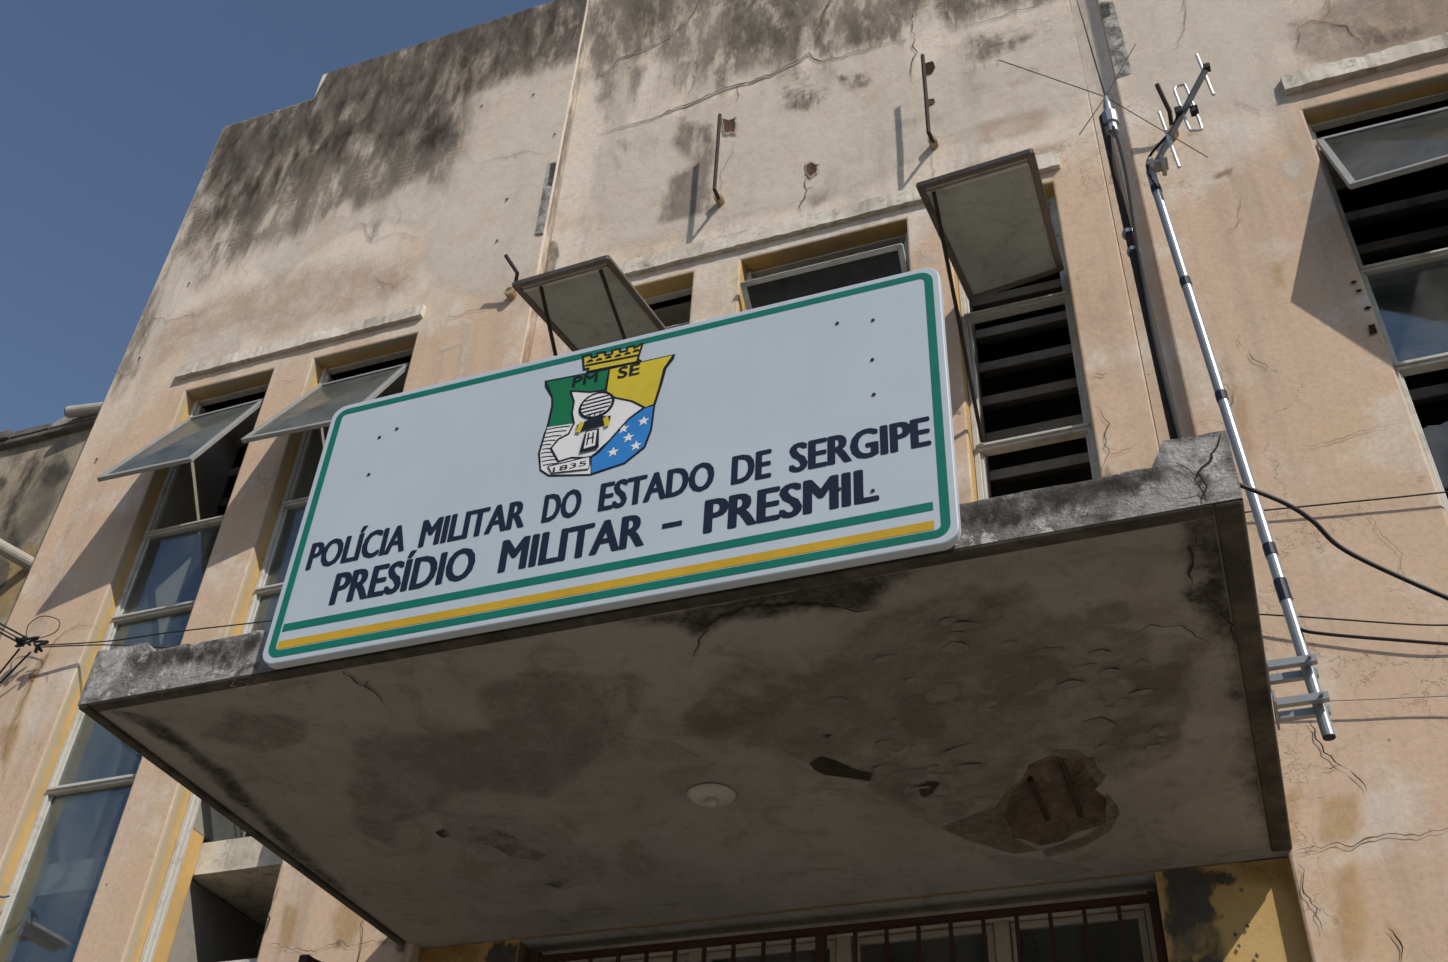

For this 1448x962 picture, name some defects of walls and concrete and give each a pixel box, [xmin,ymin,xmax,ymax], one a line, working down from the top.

crack [595,0,1047,135]
crack [1290,0,1364,50]
leakage [174,0,1006,272]
leakage [118,292,156,383]
crack [1093,372,1133,474]
leakage [0,464,67,548]
crack [1122,337,1267,646]
spalling [941,750,1119,857]
crack [1309,720,1367,790]